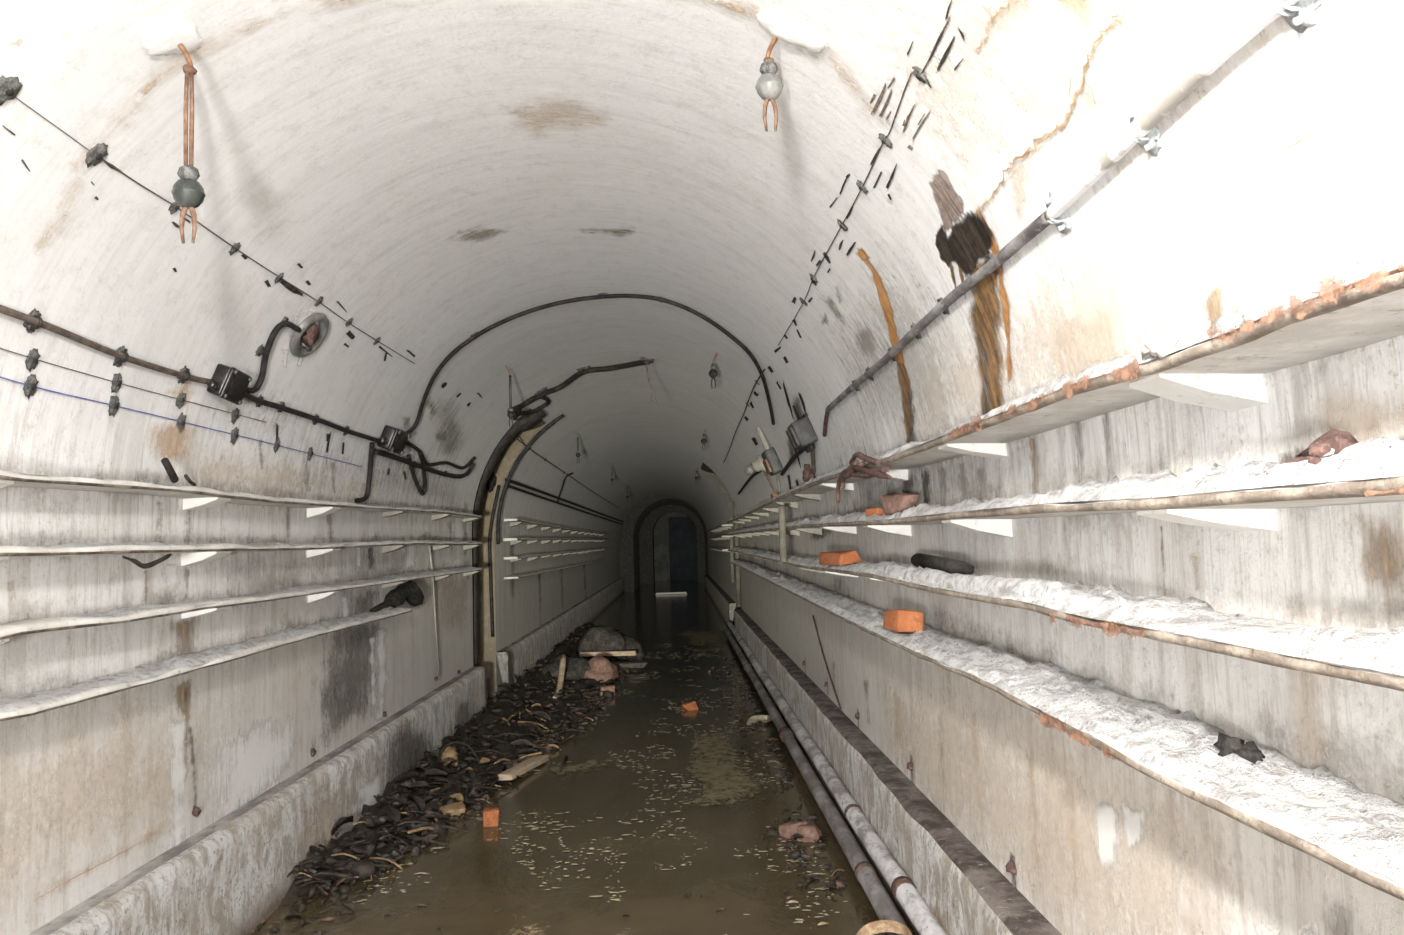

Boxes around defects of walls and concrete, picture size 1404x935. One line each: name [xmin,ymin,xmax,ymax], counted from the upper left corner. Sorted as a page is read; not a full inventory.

crack [975,0,1127,213]
rust [857,249,916,443]
rust [976,208,1012,381]
rust [1206,257,1404,343]
damp [321,591,387,734]
damp [358,726,432,818]